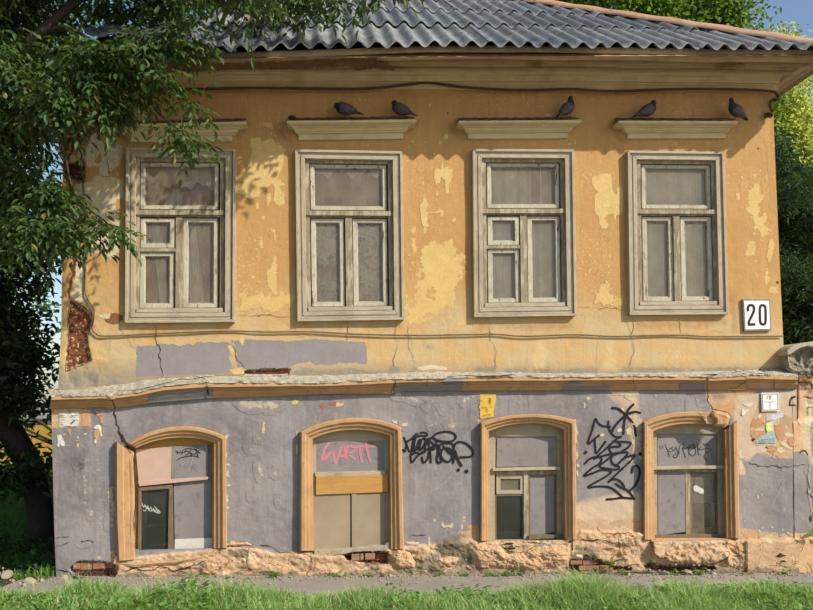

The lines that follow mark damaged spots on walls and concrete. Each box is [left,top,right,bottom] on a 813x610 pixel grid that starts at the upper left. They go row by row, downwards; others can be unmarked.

peeling [237,122,287,219]
peeling [434,162,453,196]
peeling [591,173,623,229]
peeling [59,107,124,371]
peeling [404,181,468,325]
peeling [735,171,779,294]
peeling [235,256,297,316]
crack [107,330,312,572]
peeling [751,413,808,455]
crack [749,462,813,518]
spalling [344,551,390,565]
spalling [569,559,631,572]